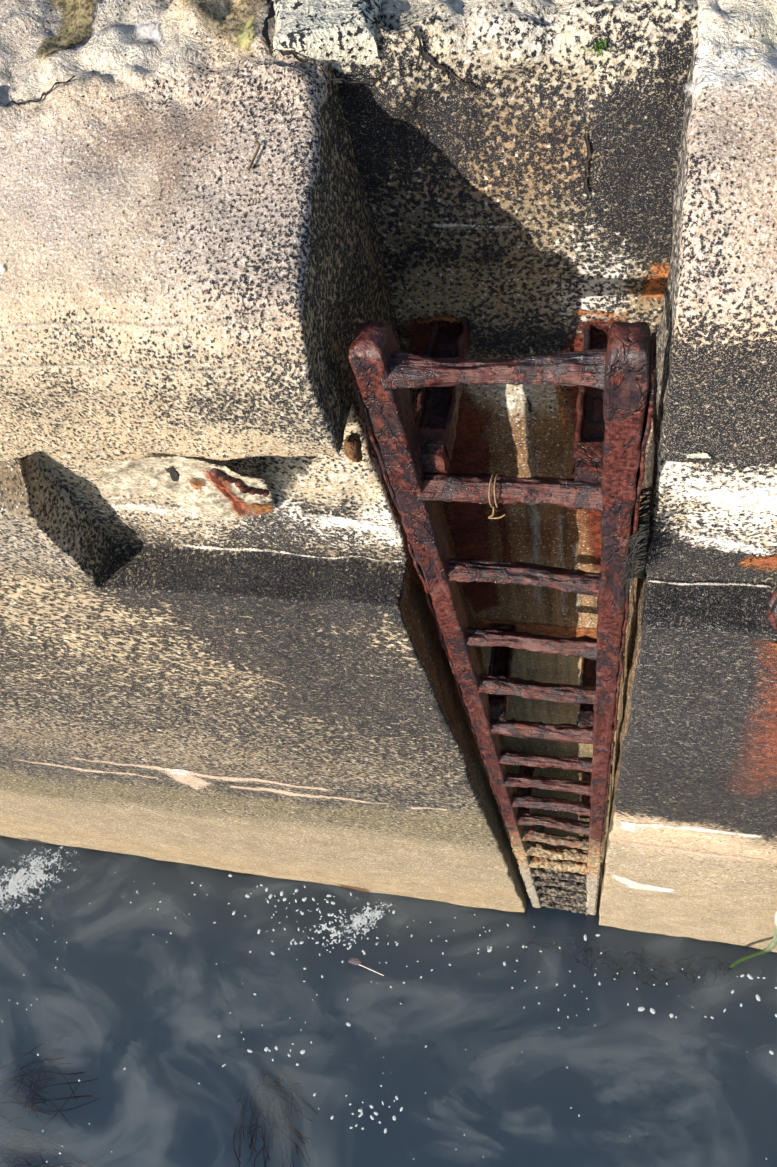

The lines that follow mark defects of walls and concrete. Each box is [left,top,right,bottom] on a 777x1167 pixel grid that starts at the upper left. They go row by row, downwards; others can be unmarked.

crack [1,76,76,106]
rust [640,263,670,300]
leakage [111,502,230,519]
leakage [308,513,399,533]
leakage [681,485,777,512]
leakage [676,531,772,556]
rust [741,555,777,571]
leakage [619,821,768,862]